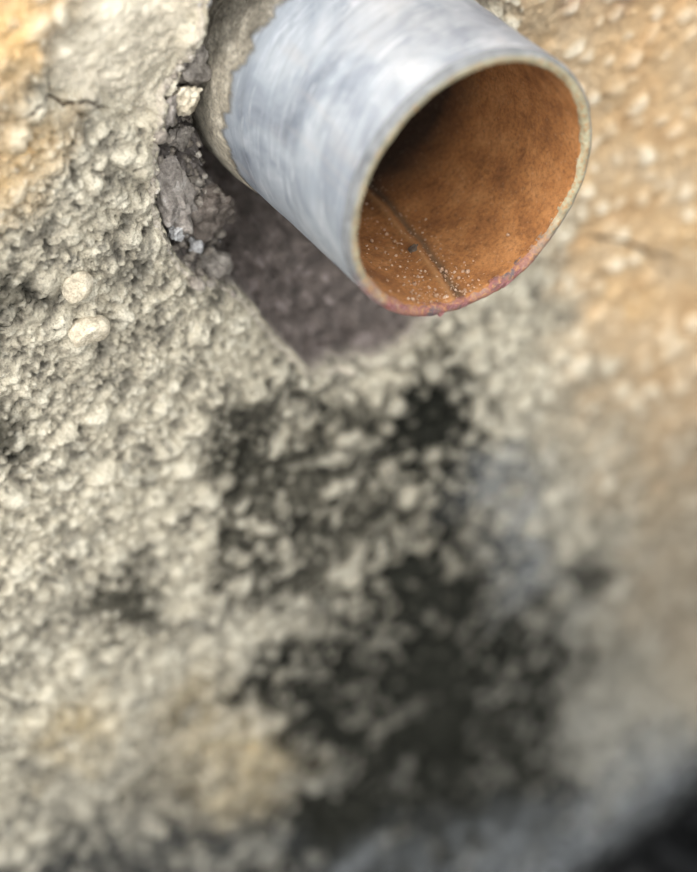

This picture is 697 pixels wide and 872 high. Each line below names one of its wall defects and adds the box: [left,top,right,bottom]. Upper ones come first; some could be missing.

peeling [51,0,179,89]
spalling [147,0,469,379]
leakage [0,410,25,458]
leakage [39,347,697,872]